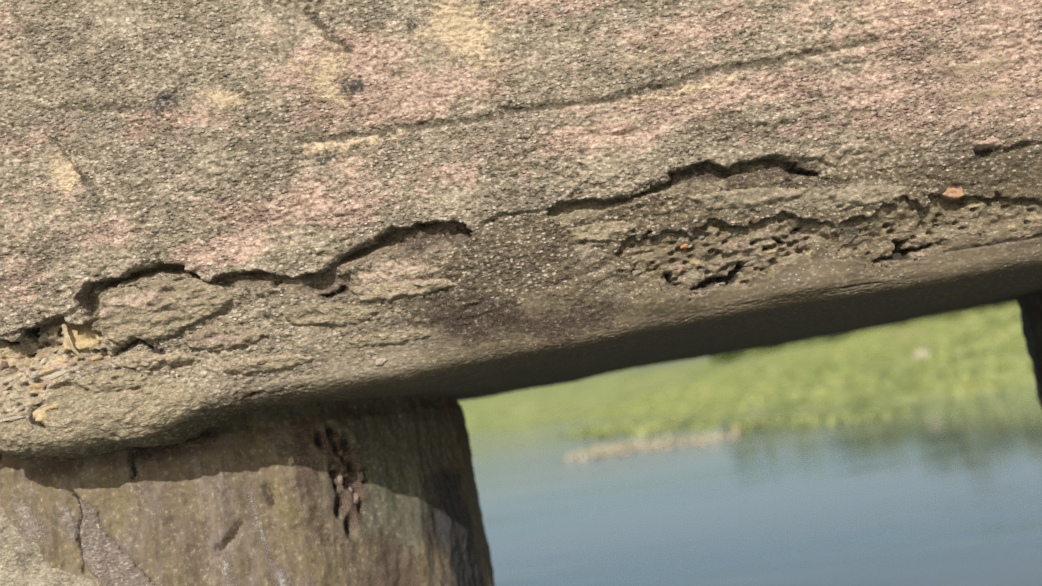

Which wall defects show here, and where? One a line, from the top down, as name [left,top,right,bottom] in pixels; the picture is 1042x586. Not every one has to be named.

spalling [548,159,1042,313]
spalling [0,222,471,423]
crack [72,492,84,574]